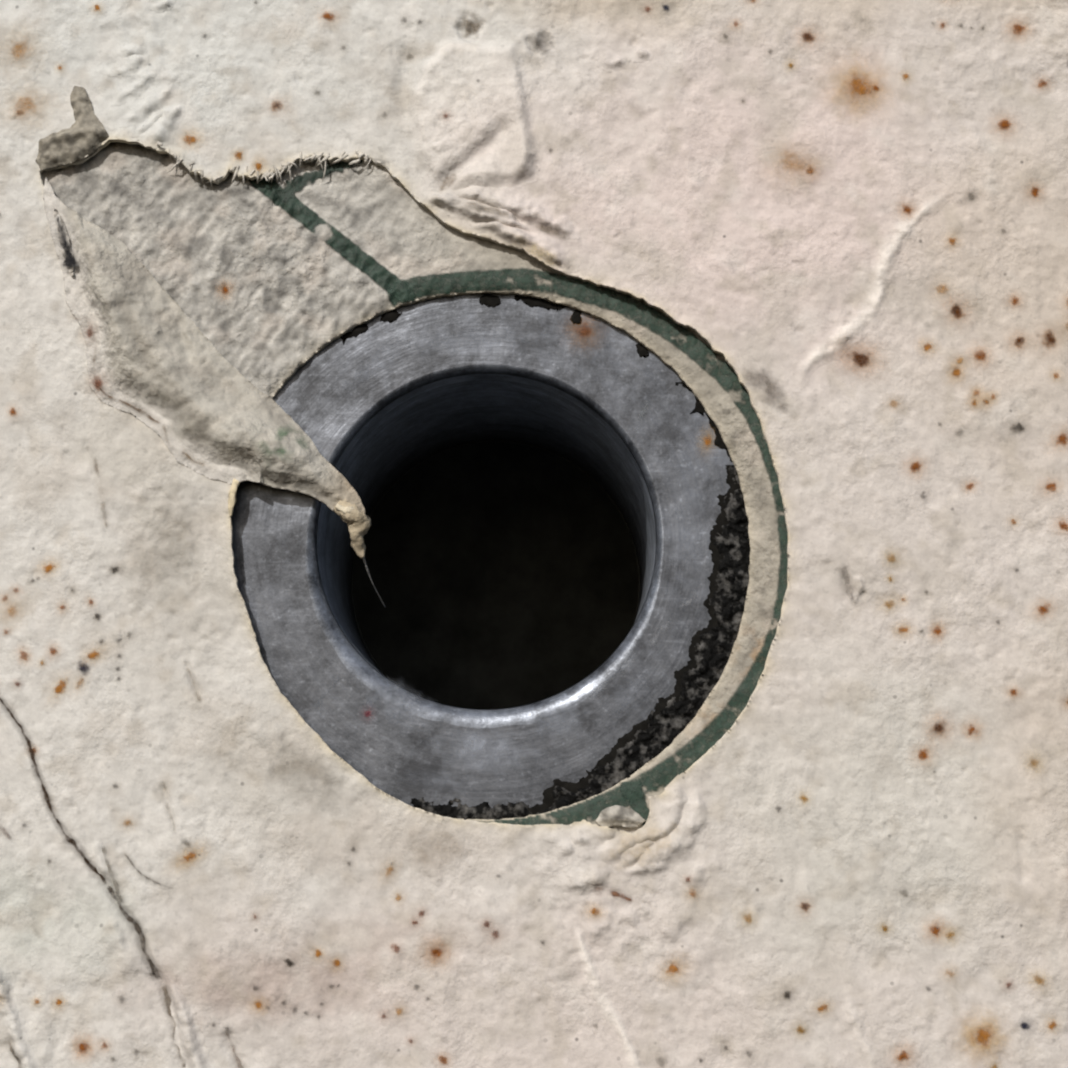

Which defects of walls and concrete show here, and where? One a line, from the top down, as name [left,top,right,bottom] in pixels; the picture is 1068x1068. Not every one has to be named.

rust [951,305,962,318]
rust [853,351,869,367]
peeling [35,86,788,942]
crack [0,698,243,1068]
rust [970,1026,994,1048]